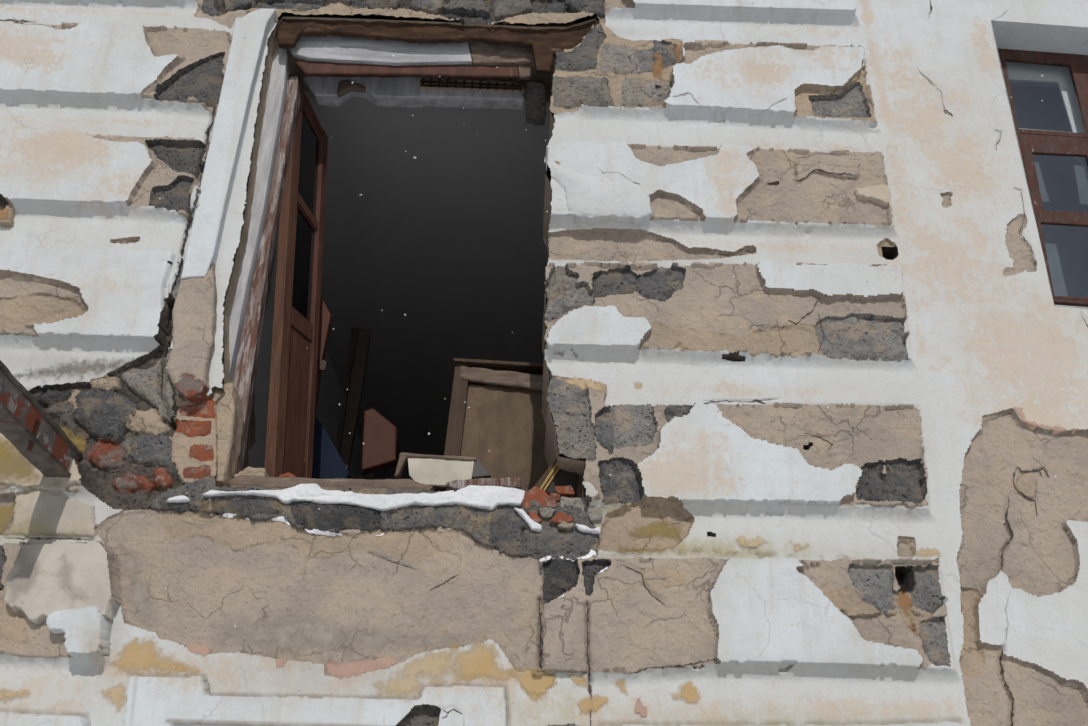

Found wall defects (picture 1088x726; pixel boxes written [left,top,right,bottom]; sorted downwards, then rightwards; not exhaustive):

spalling [140,0,876,123]
spalling [87,133,210,223]
peeling [734,146,893,225]
peeling [0,269,88,337]
spalling [544,190,910,362]
peeling [1003,214,1037,276]
spalling [715,402,928,509]
peeling [0,373,730,677]
peeling [796,408,1088,726]